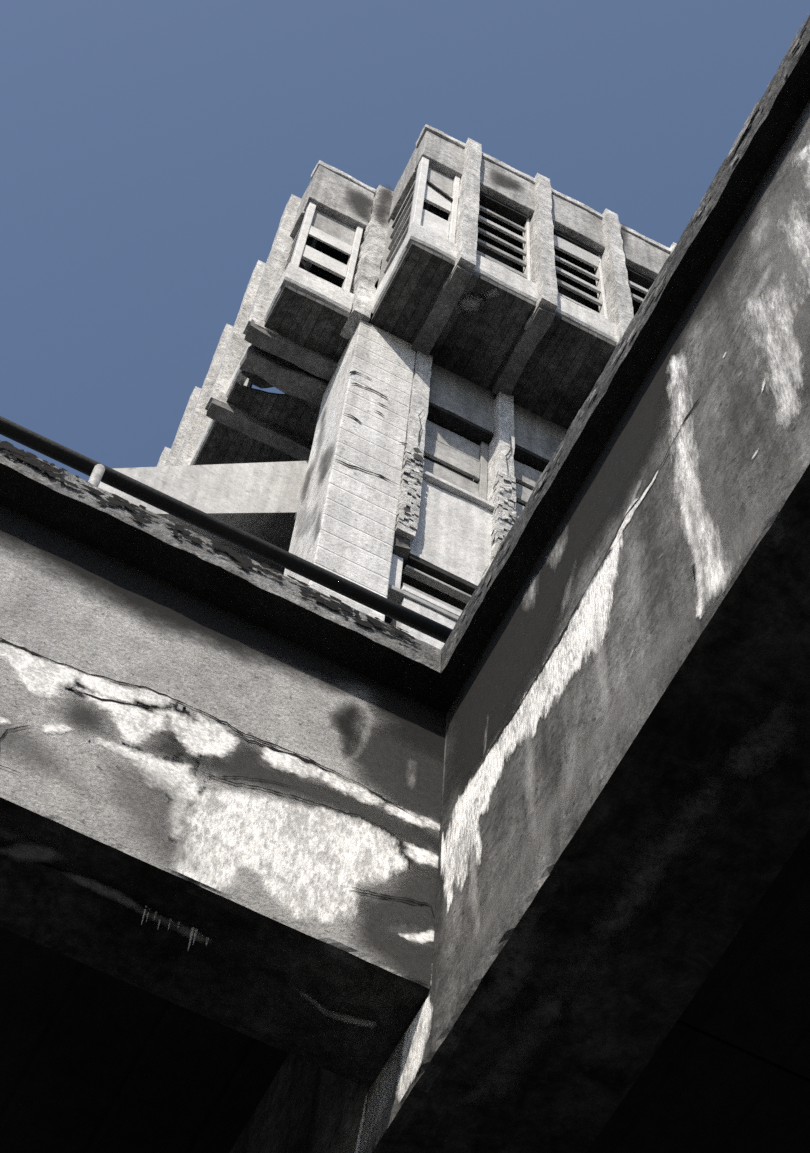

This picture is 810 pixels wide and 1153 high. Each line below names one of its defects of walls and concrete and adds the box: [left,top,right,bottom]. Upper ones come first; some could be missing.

crack [0,388,706,841]
leakage [0,108,810,986]
leakage [355,996,432,1153]